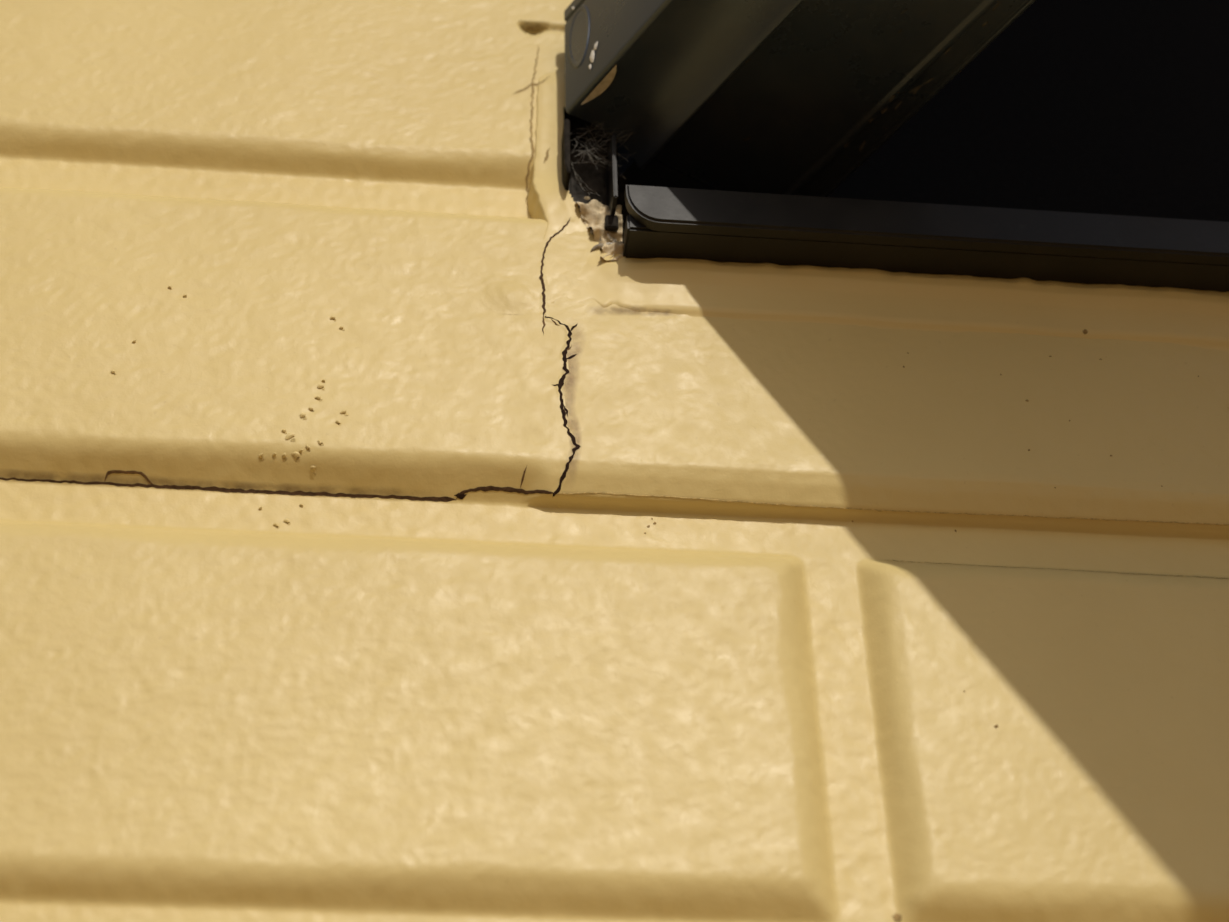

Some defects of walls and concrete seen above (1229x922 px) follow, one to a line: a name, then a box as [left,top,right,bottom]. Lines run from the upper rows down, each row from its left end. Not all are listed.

crack [514,47,550,204]
crack [0,216,1229,525]